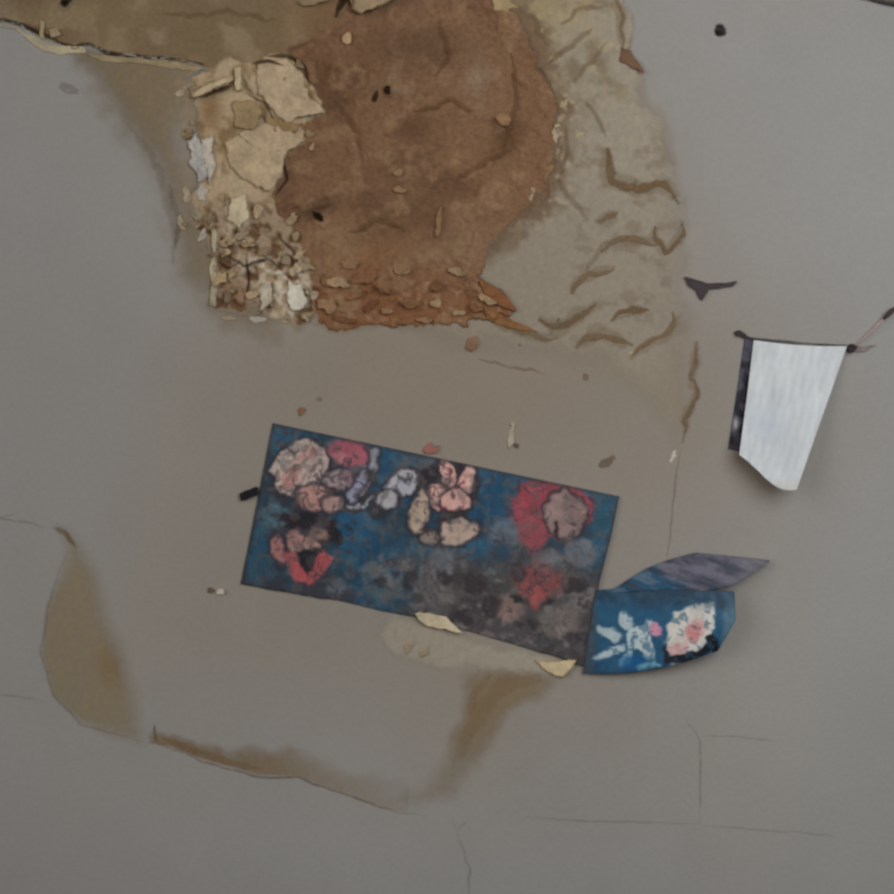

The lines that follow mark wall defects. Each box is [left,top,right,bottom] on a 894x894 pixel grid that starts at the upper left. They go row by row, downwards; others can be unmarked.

flaking render [0,0,686,382]